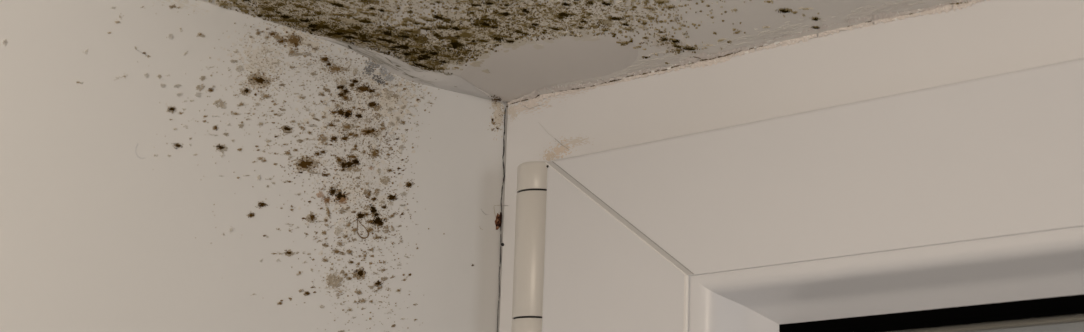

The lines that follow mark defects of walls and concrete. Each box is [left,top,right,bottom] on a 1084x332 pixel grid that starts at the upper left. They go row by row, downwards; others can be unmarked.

flaking render [873,0,989,25]
flaking render [568,28,818,93]
damp [144,0,823,332]